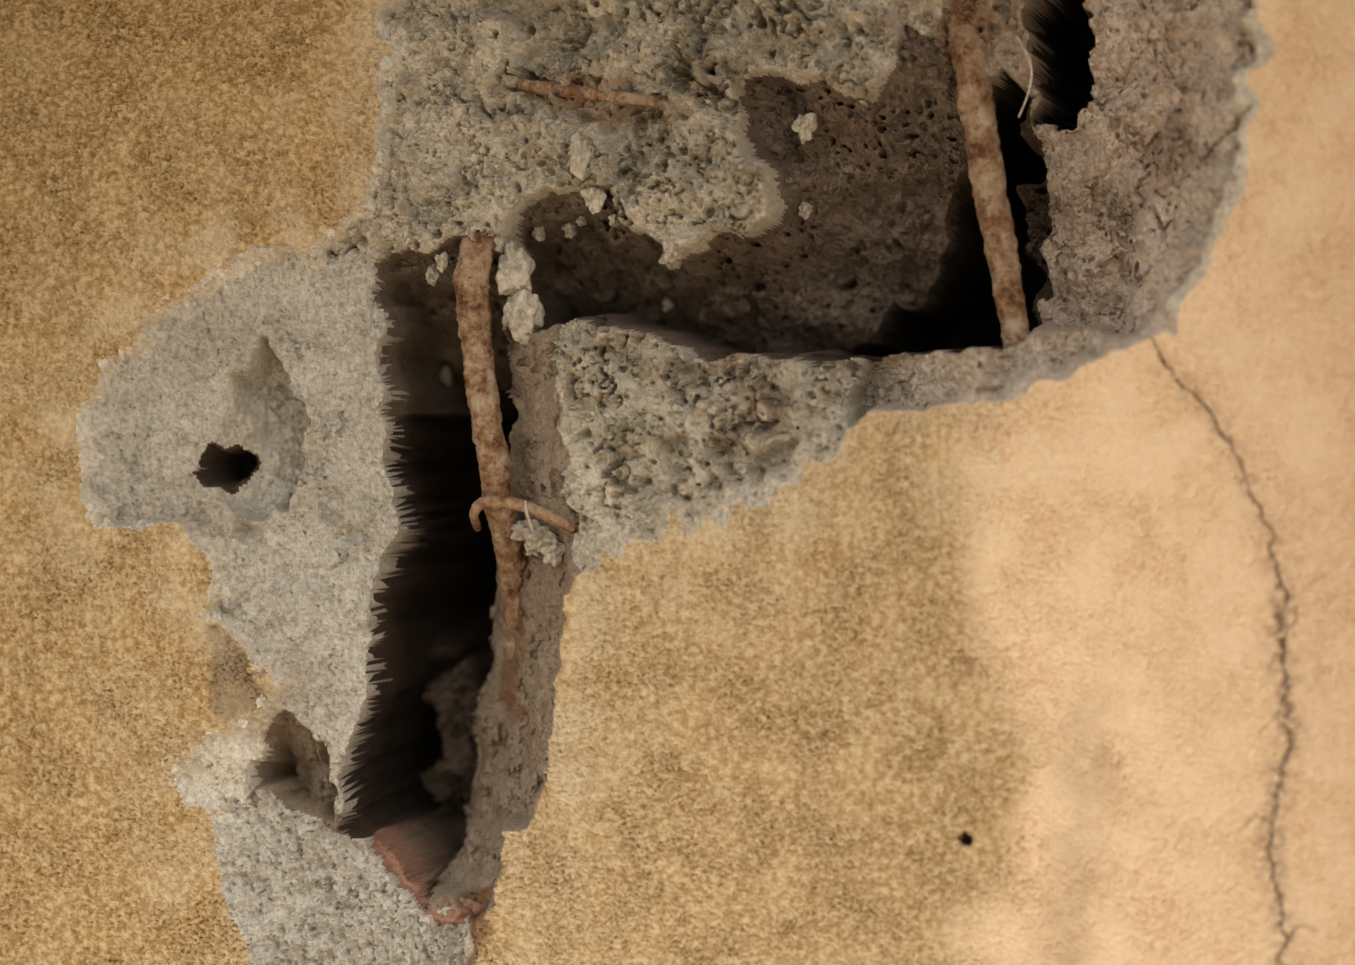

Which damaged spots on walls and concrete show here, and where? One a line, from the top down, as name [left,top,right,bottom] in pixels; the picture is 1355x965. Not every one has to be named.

spalling [297,0,1274,576]
spalling [75,243,477,965]
crack [1150,336,1314,965]